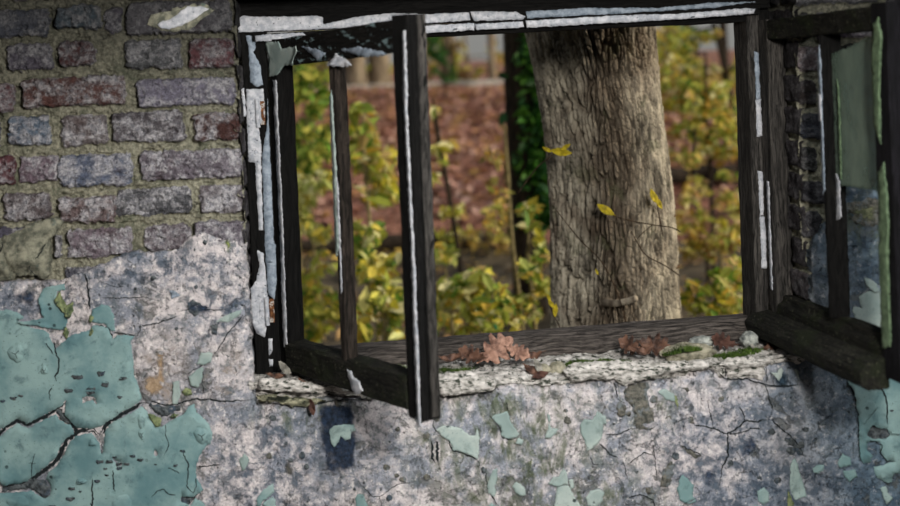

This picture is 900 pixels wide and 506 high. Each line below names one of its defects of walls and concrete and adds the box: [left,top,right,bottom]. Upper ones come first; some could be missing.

peeling [157,6,208,29]
crack [85,275,216,338]
peeling [0,284,213,506]
crack [0,316,251,506]
peeling [492,411,523,445]
peeling [512,482,526,496]
peeling [548,468,604,506]
crack [590,428,657,506]
spalling [616,382,689,431]
peeling [645,446,701,506]
crack [670,367,804,485]
peeling [837,379,900,505]